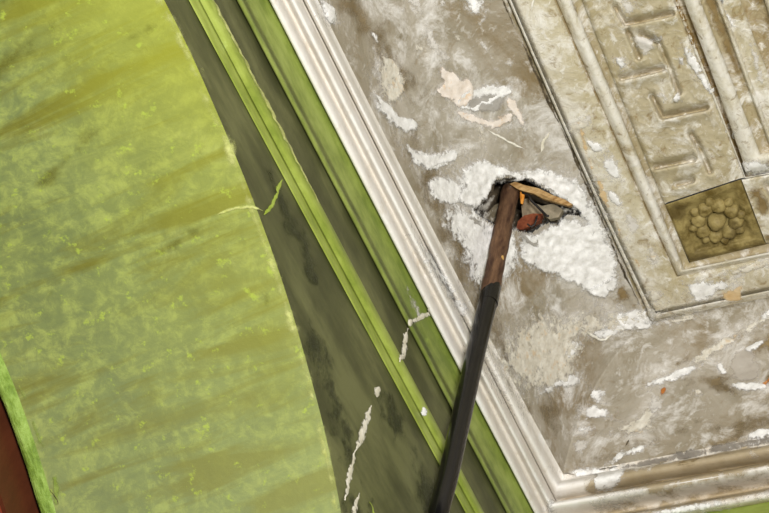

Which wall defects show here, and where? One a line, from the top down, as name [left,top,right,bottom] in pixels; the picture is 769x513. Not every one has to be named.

damp [344,0,382,38]
peeling [370,53,467,204]
flaking render [431,67,526,148]
damp [428,200,468,260]
peeling [420,242,468,325]
damp [707,377,727,391]
damp [586,436,769,513]